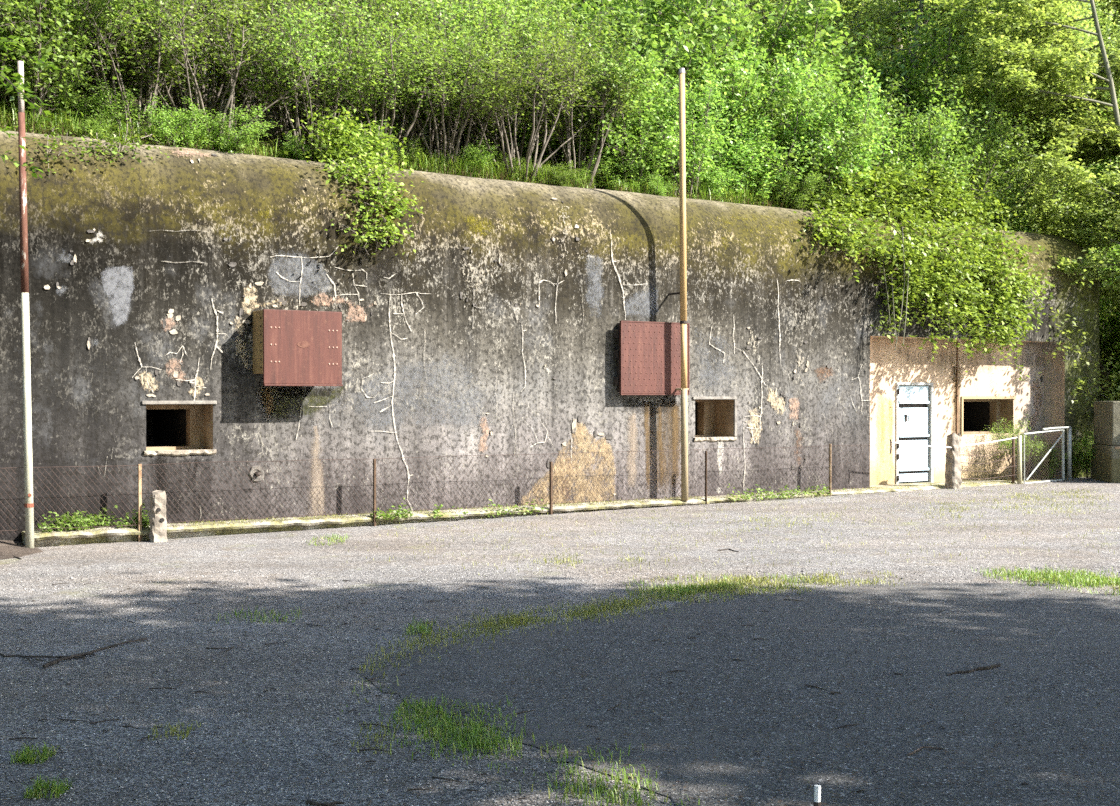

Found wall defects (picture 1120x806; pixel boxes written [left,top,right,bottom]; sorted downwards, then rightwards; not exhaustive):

spalling [162,309,181,334]
spalling [230,281,377,369]
spalling [135,360,210,397]
crack [270,247,429,512]
corrosion [645,404,680,482]